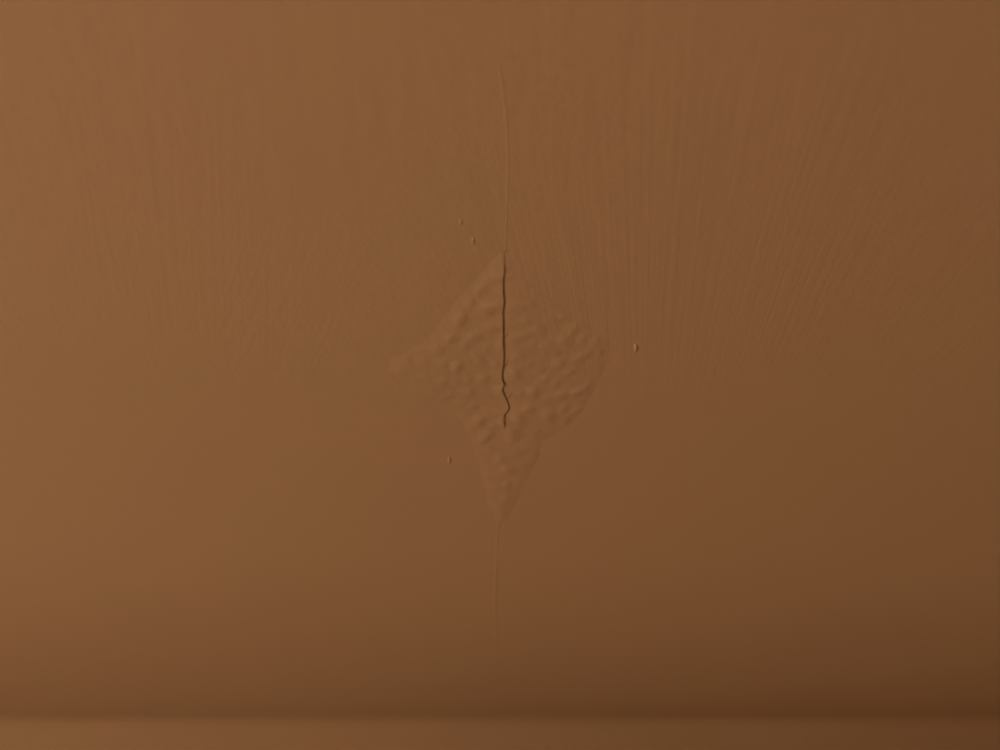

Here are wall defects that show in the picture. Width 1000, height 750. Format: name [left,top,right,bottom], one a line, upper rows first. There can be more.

crack [502,249,512,425]